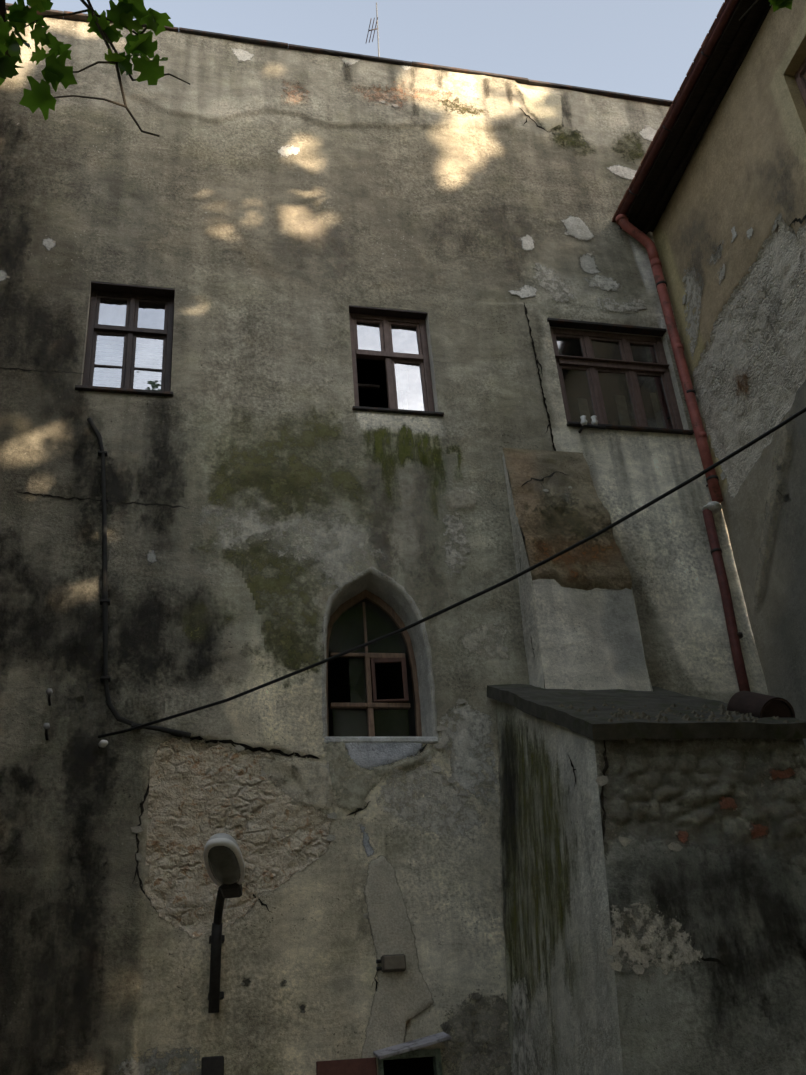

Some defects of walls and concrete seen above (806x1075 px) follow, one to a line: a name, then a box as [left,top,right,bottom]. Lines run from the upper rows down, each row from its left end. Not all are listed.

flaking render [278,145,300,158]
flaking render [521,235,535,251]
flaking render [508,263,575,302]
flaking render [579,253,647,314]
crack [521,303,567,487]
spalling [682,213,806,498]
water stain [204,497,387,587]
crack [171,734,320,759]
flaking render [421,698,500,806]
spalling [131,737,337,939]
water stain [498,735,516,863]